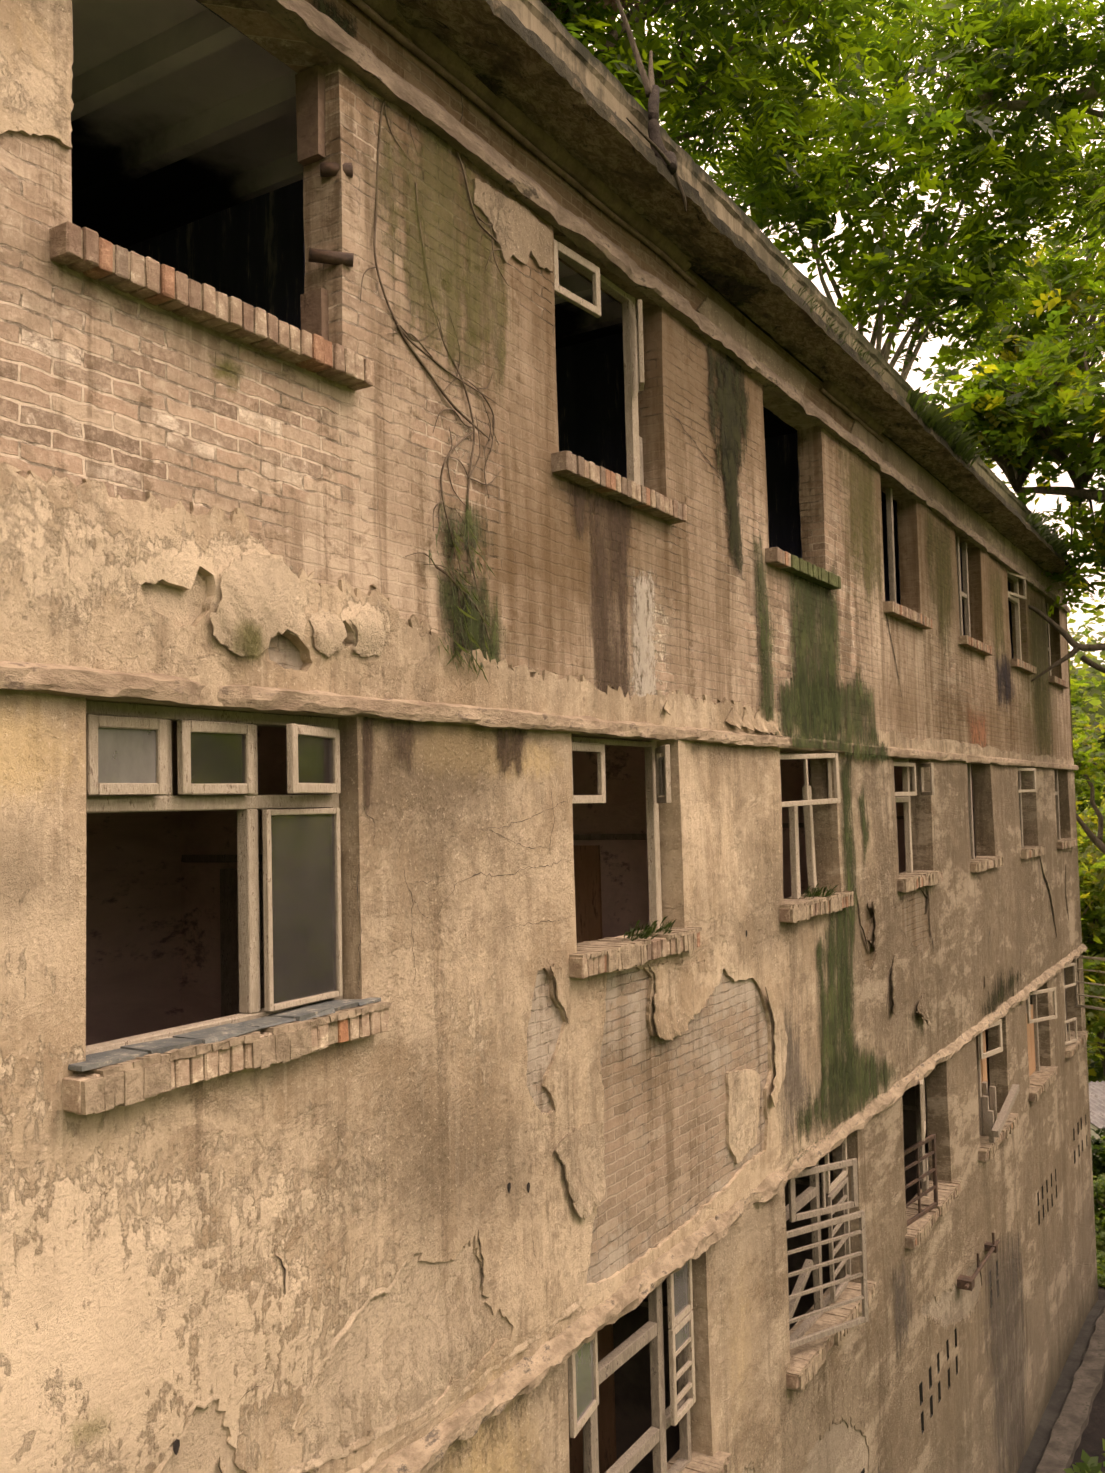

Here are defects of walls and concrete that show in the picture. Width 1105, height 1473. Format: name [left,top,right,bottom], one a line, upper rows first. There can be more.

peeling [0,130,404,590]
flaking render [141,566,215,627]
flaking render [268,631,312,672]
flaking render [342,620,354,647]
damp [570,482,656,700]
damp [783,1012,807,1135]
peeling [278,960,788,1473]